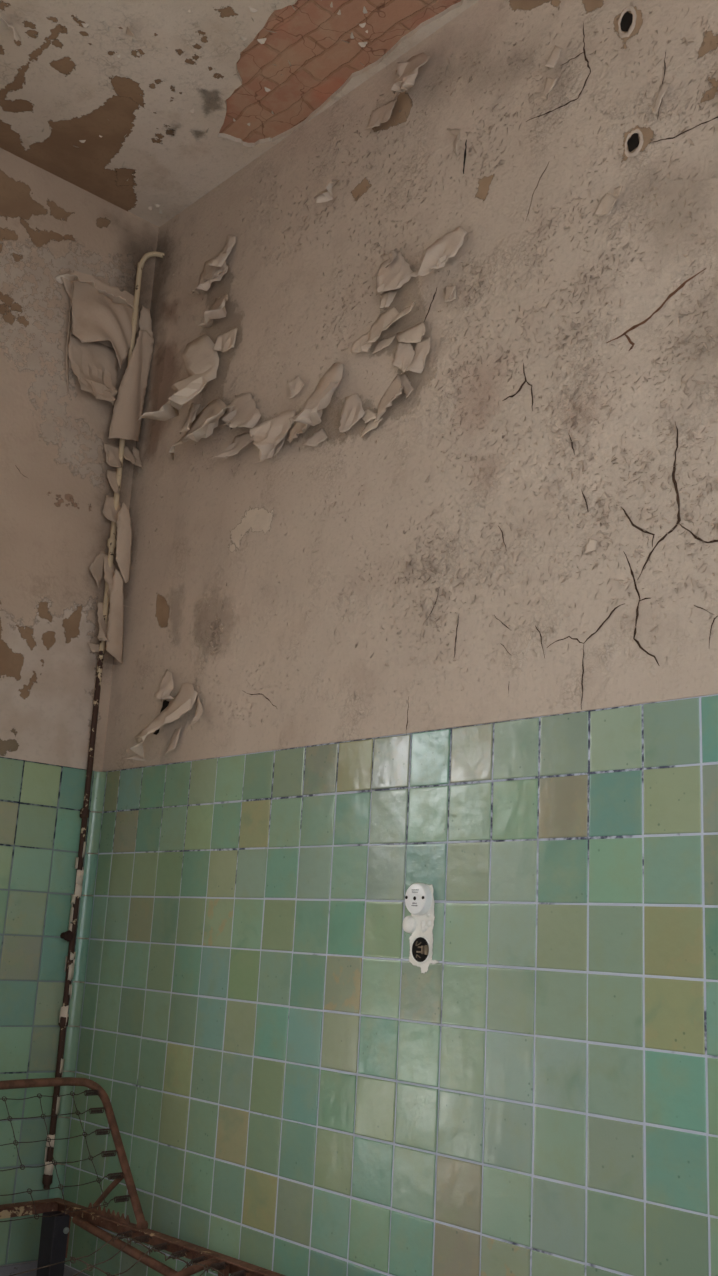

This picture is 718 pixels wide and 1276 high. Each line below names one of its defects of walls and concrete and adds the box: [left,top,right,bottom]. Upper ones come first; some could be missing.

peeling [214,6,238,18]
peeling [0,15,182,211]
peeling [175,30,224,79]
flaking render [219,0,461,143]
peeling [0,170,75,262]
flaking render [351,177,372,201]
flaking render [475,174,494,201]
crack [607,268,706,351]
crack [503,363,533,411]
peeling [0,226,467,769]
crack [494,422,718,710]
crack [427,587,459,657]